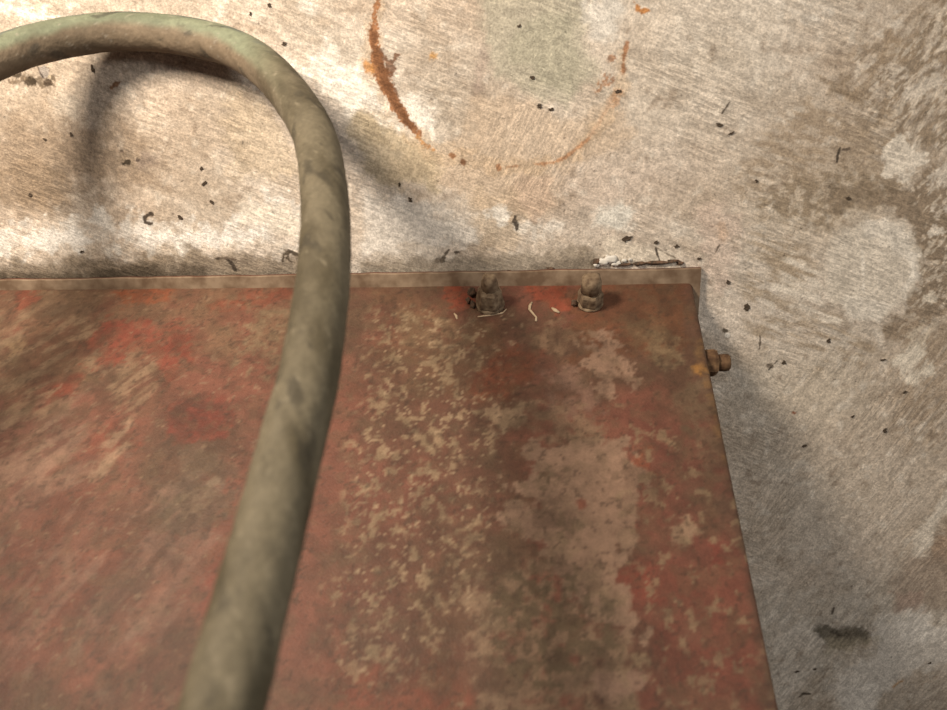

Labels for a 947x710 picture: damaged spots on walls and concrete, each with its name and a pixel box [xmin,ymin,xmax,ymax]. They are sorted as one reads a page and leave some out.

corrosion [357,0,634,181]
water stain [688,162,906,298]